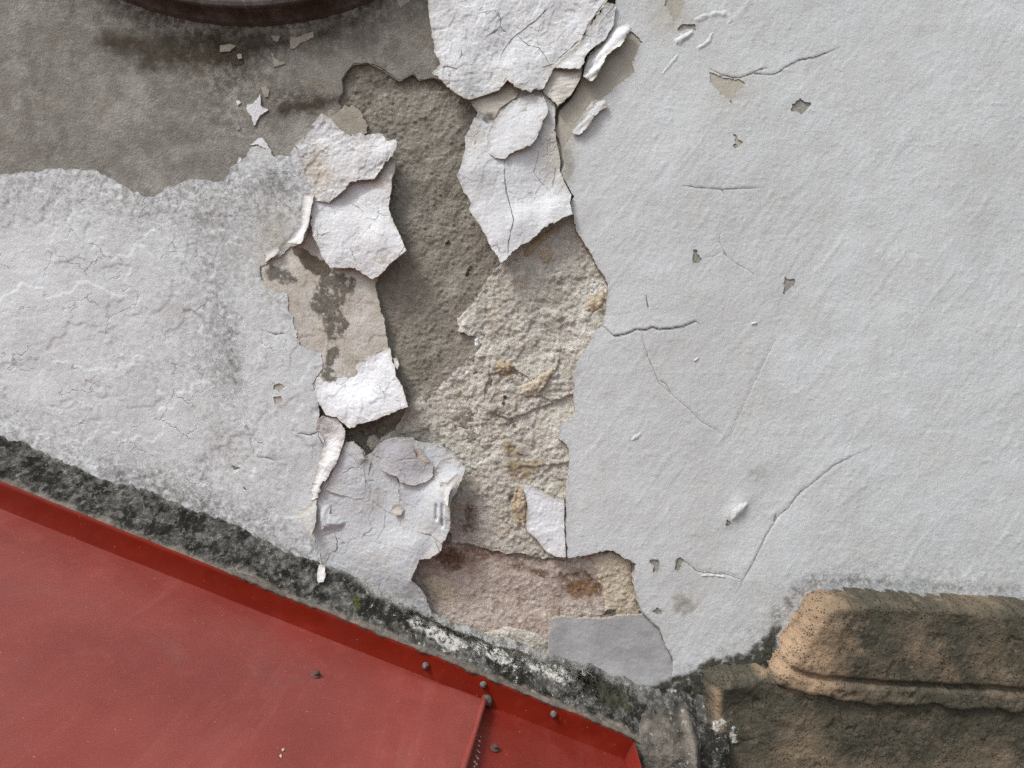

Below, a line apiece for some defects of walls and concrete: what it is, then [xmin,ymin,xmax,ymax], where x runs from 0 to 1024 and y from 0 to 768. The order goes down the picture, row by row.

spalling [219,44,244,65]
crack [710,46,840,78]
peeling [791,99,811,114]
spalling [261,0,661,654]
crack [603,295,776,439]
leakage [503,442,544,479]
crack [685,450,864,589]
leakage [404,608,572,682]
leakage [653,615,782,695]
leakage [705,718,738,743]